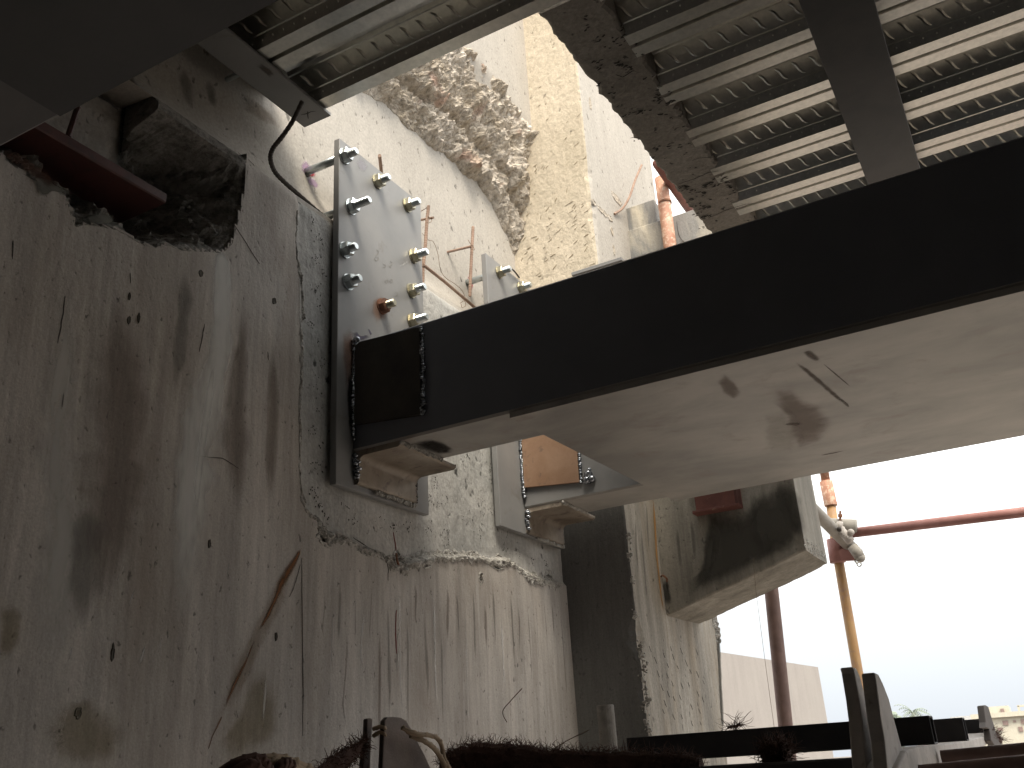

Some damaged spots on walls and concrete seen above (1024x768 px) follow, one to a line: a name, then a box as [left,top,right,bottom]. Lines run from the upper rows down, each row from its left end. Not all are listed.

spalling [0,97,248,253]
spalling [363,47,539,255]
flaking render [268,100,563,591]
leakage [698,488,802,585]